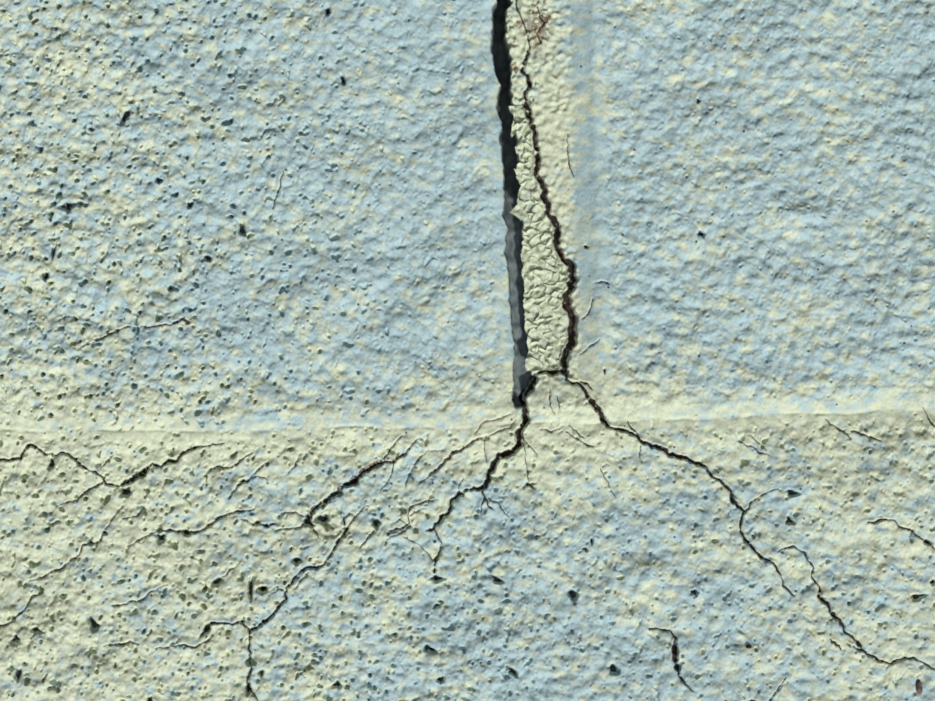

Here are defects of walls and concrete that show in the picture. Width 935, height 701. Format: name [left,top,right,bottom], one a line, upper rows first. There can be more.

crack [77,318,191,350]
crack [387,0,935,669]
crack [0,443,224,626]
crack [103,505,368,701]
crack [127,435,419,547]
crack [649,628,694,692]